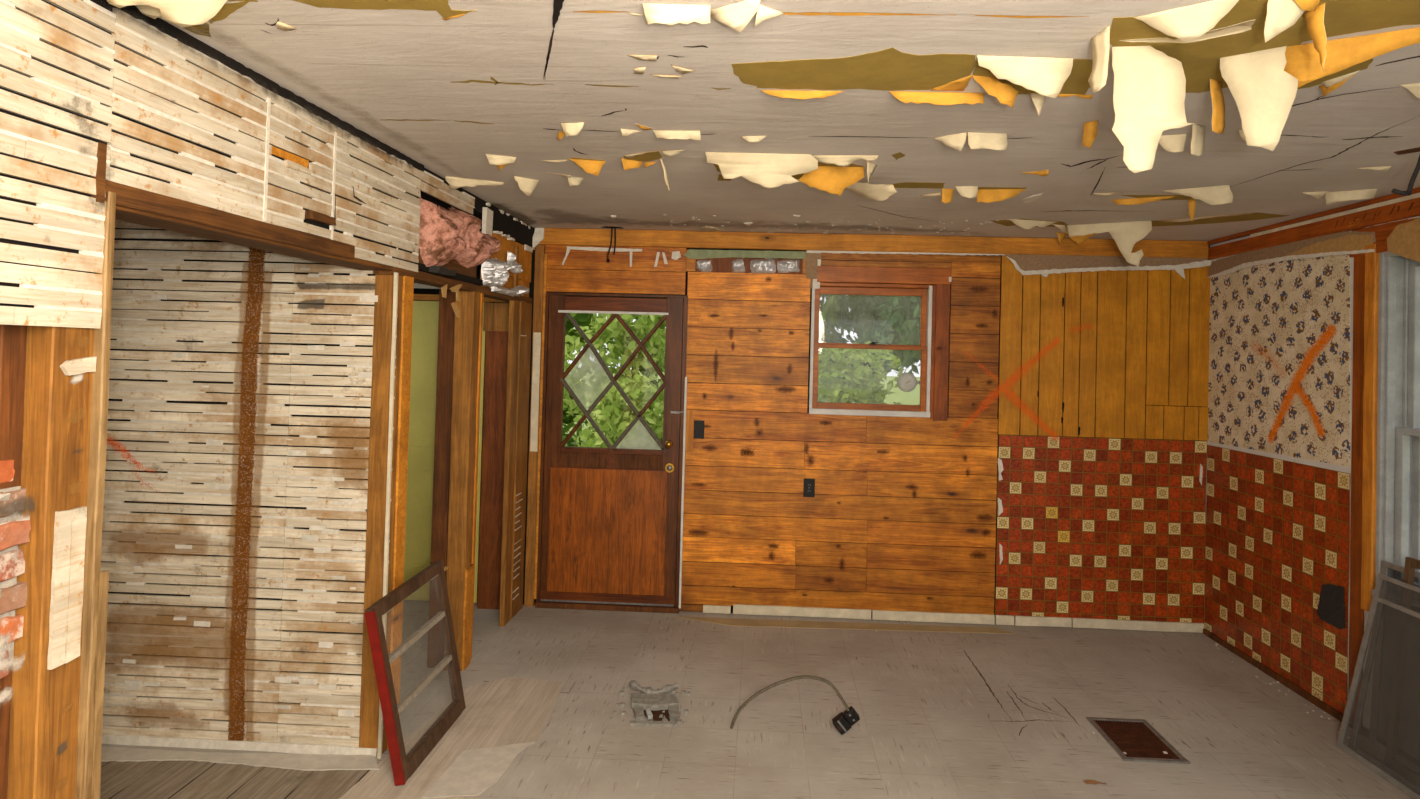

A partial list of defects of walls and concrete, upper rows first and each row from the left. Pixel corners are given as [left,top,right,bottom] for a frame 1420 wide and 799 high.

crack [782,10,937,18]
crack [975,12,1090,20]
peeling [276,21,296,31]
crack [451,11,620,86]
crack [545,45,708,155]
crack [387,117,490,125]
crack [1230,56,1420,187]
crack [813,133,910,141]
spalling [420,191,494,231]